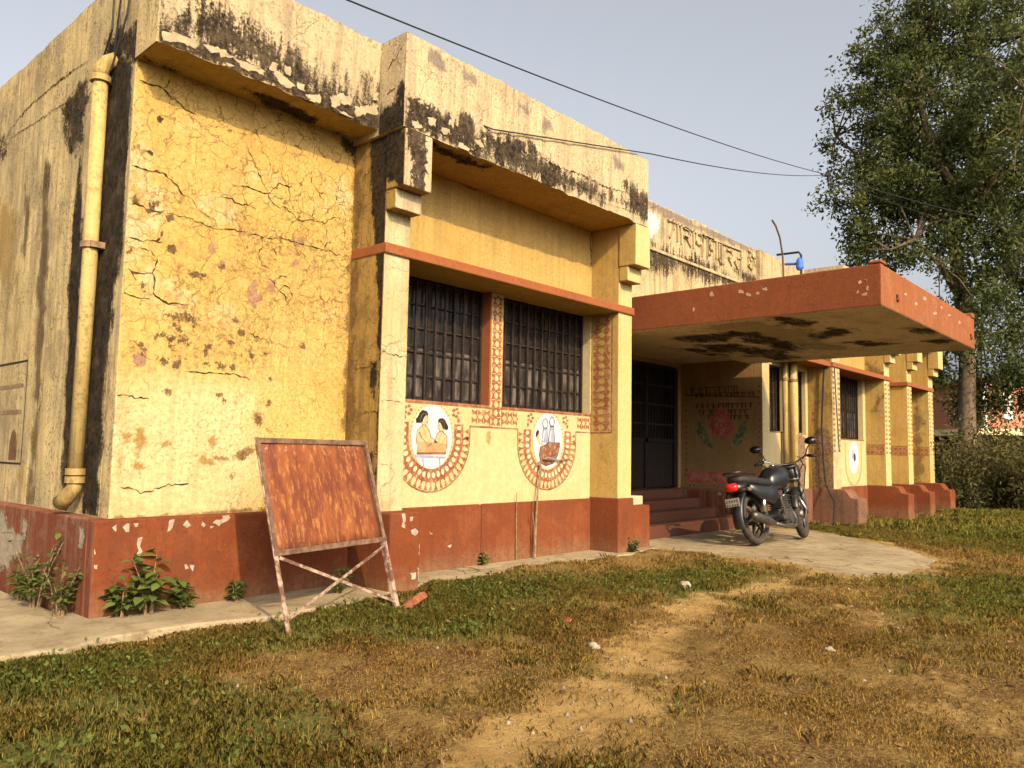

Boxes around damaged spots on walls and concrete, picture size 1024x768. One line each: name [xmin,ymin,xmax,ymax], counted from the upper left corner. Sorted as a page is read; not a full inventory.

crack [141,79,195,114]
peeling [162,31,379,123]
spalling [132,194,177,254]
crack [124,142,347,305]
damp [159,0,756,485]
damp [60,70,91,489]
damp [82,44,133,516]
spalling [131,312,235,371]
damp [671,316,896,361]
crack [186,371,249,379]
peeling [112,523,143,556]
peeling [167,515,231,532]